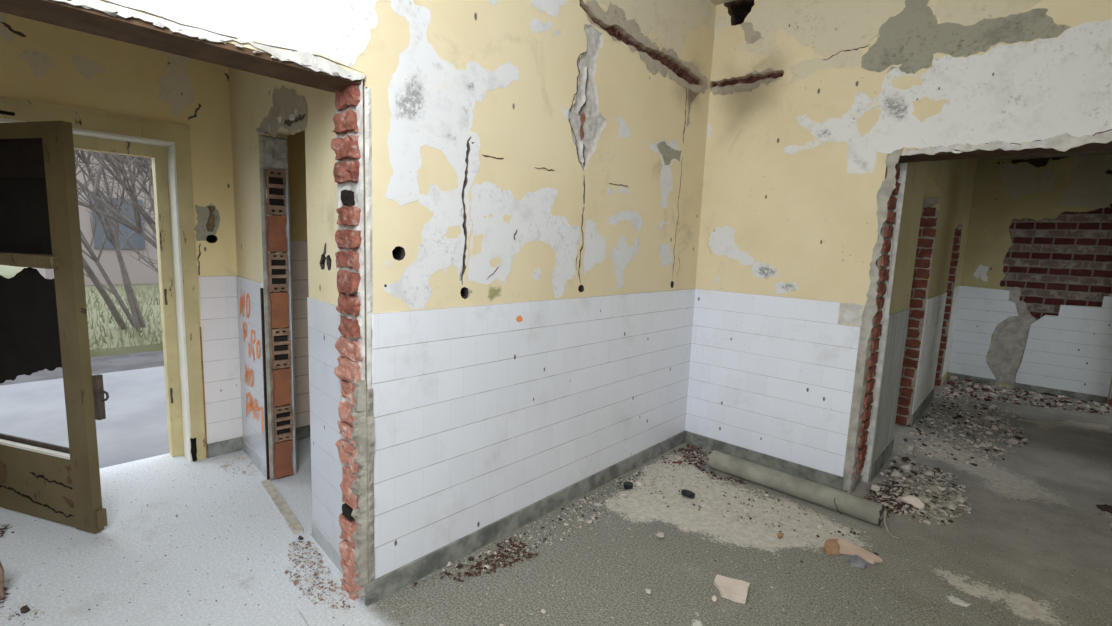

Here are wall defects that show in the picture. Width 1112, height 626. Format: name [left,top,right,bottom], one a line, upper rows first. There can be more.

crack [0,472,74,517]
spalling [256,85,307,481]
peeling [52,0,643,310]
flaking render [334,205,366,600]
crack [459,137,474,297]
crack [568,52,588,283]
crack [672,89,699,278]
peeling [599,0,1112,493]